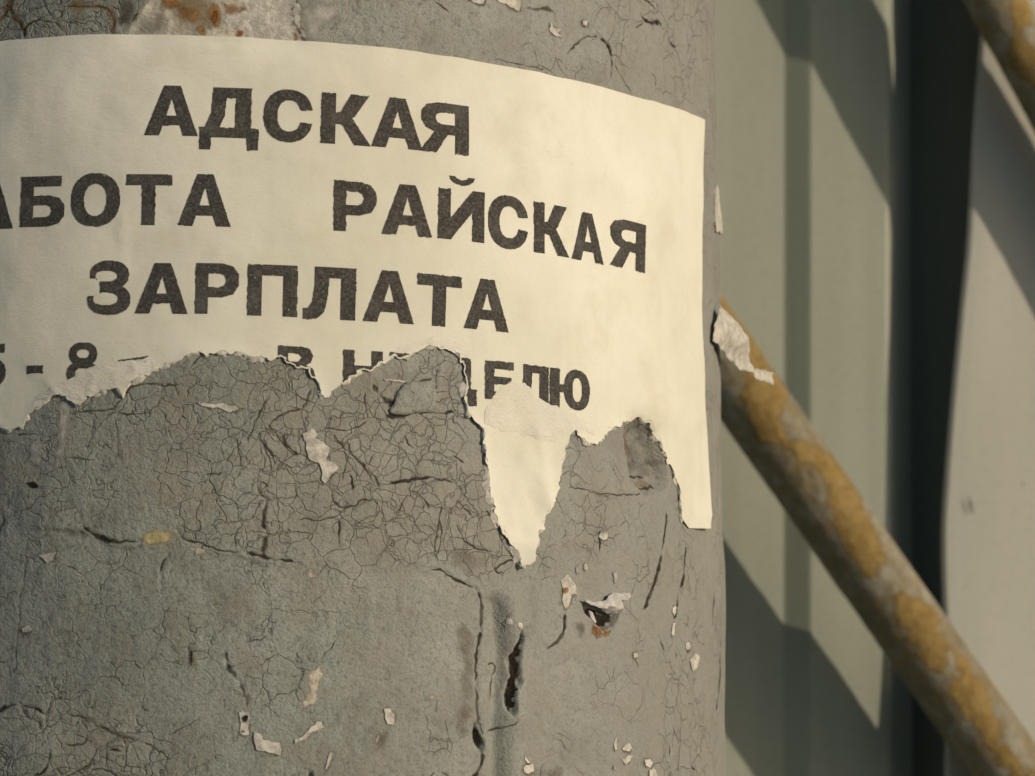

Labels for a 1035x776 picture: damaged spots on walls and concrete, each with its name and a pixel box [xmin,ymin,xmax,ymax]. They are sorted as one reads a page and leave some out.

crack [0,0,139,37]
peeling [131,0,338,41]
peeling [472,0,521,11]
crack [636,0,675,47]
crack [568,36,630,90]
crack [74,382,179,460]
crack [180,390,311,563]
crack [84,527,138,543]
crack [298,369,519,776]
spalling [560,563,631,636]
crack [548,614,566,648]
crack [0,704,196,776]